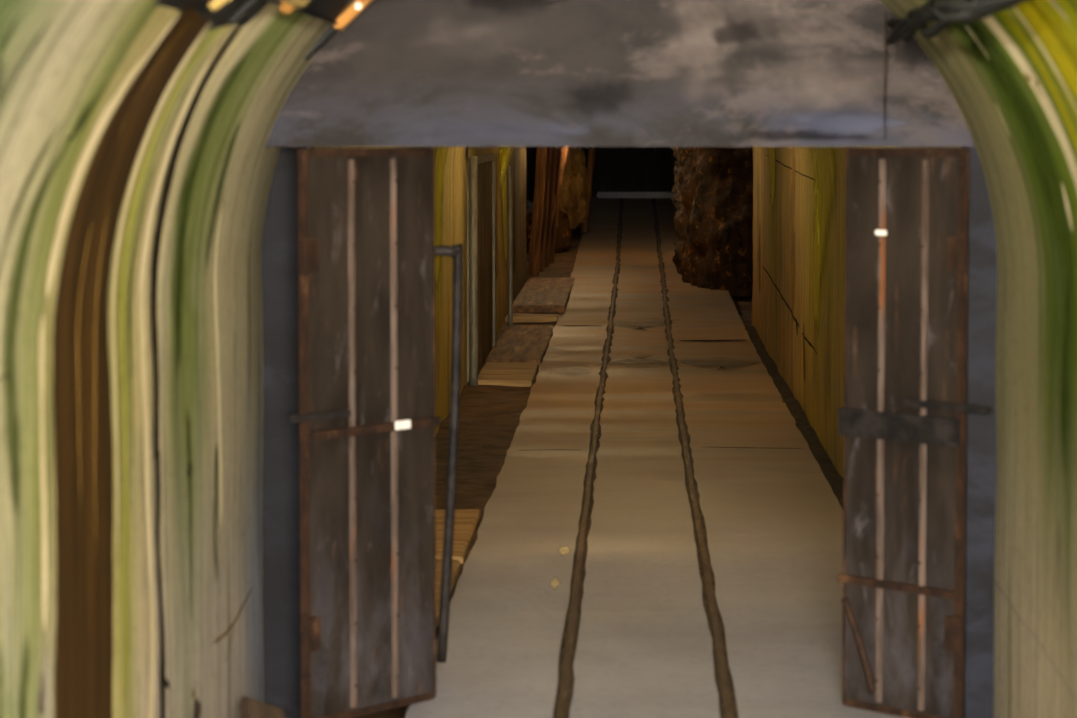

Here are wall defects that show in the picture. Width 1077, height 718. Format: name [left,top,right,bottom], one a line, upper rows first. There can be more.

leakage [21,646,29,718]
leakage [39,313,47,631]
leakage [0,16,178,508]
leakage [111,23,221,718]
leakage [163,52,249,427]
leakage [206,124,240,568]
leakage [933,0,1077,442]